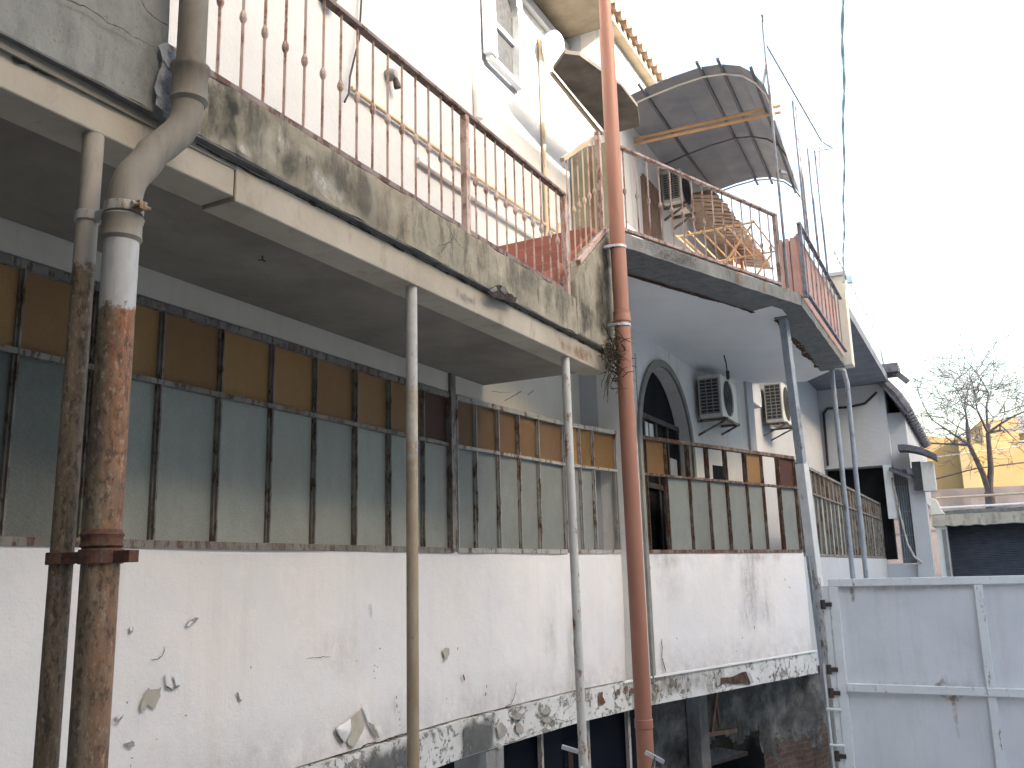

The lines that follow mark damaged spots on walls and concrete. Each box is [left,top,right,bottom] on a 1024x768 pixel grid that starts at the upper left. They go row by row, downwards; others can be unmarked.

crack [68,0,150,46]
damp [583,243,609,332]
peeling [140,687,163,711]
spalling [717,672,754,686]
peeling [362,704,382,738]
peeling [496,706,551,749]